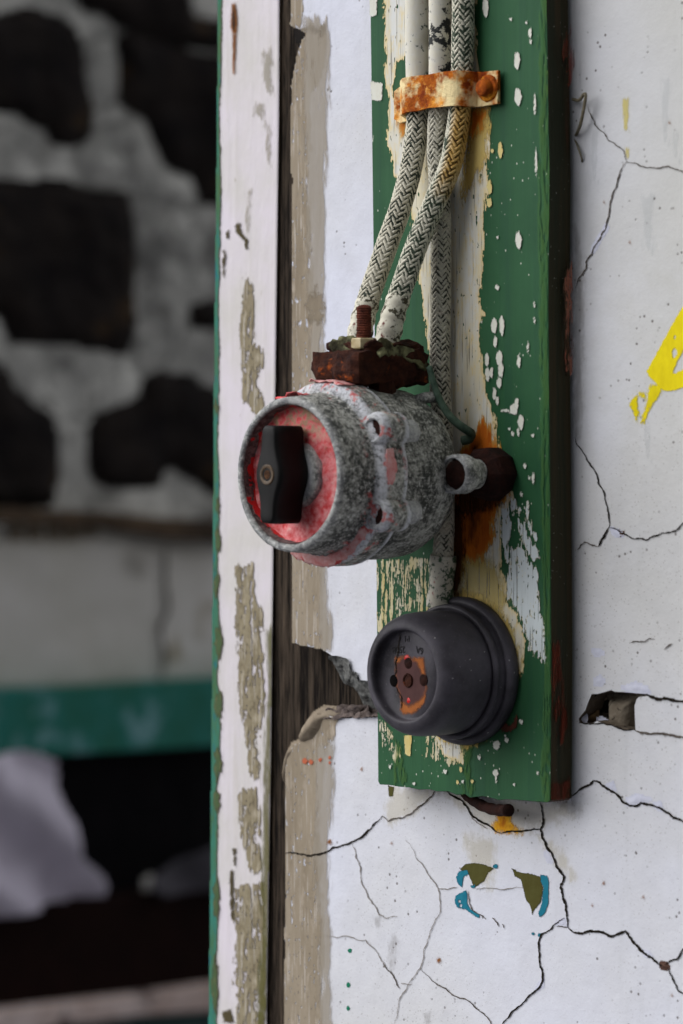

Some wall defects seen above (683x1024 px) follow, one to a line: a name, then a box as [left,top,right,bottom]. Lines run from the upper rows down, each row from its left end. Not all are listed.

peeling [369,0,405,178]
peeling [289,0,330,392]
crack [575,108,683,288]
peeling [450,132,534,454]
peeling [208,0,265,1024]
rust [459,416,501,455]
rust [453,492,518,657]
peeling [458,491,546,674]
crack [574,437,683,549]
peeling [284,555,400,1024]
crack [572,780,683,822]
crack [285,791,683,1024]